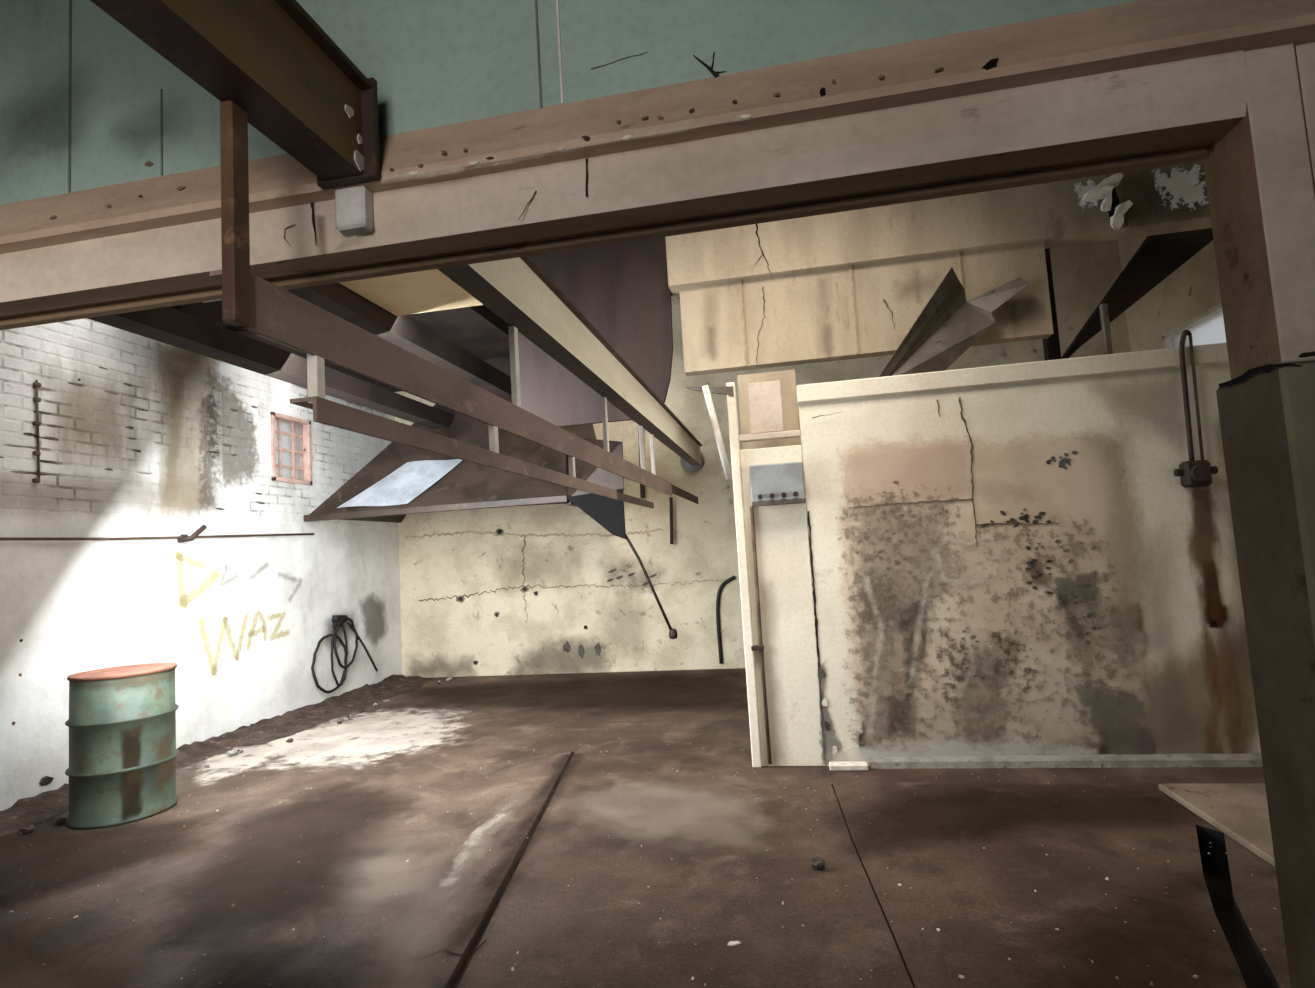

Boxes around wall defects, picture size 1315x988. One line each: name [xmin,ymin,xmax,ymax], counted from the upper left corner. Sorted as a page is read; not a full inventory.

peeling [1074,179,1098,210]
peeling [1152,163,1209,211]
water stain [163,347,256,507]
crack [848,397,1059,546]
rust [1190,487,1222,620]
water stain [832,732,1117,764]
water stain [1141,631,1253,754]